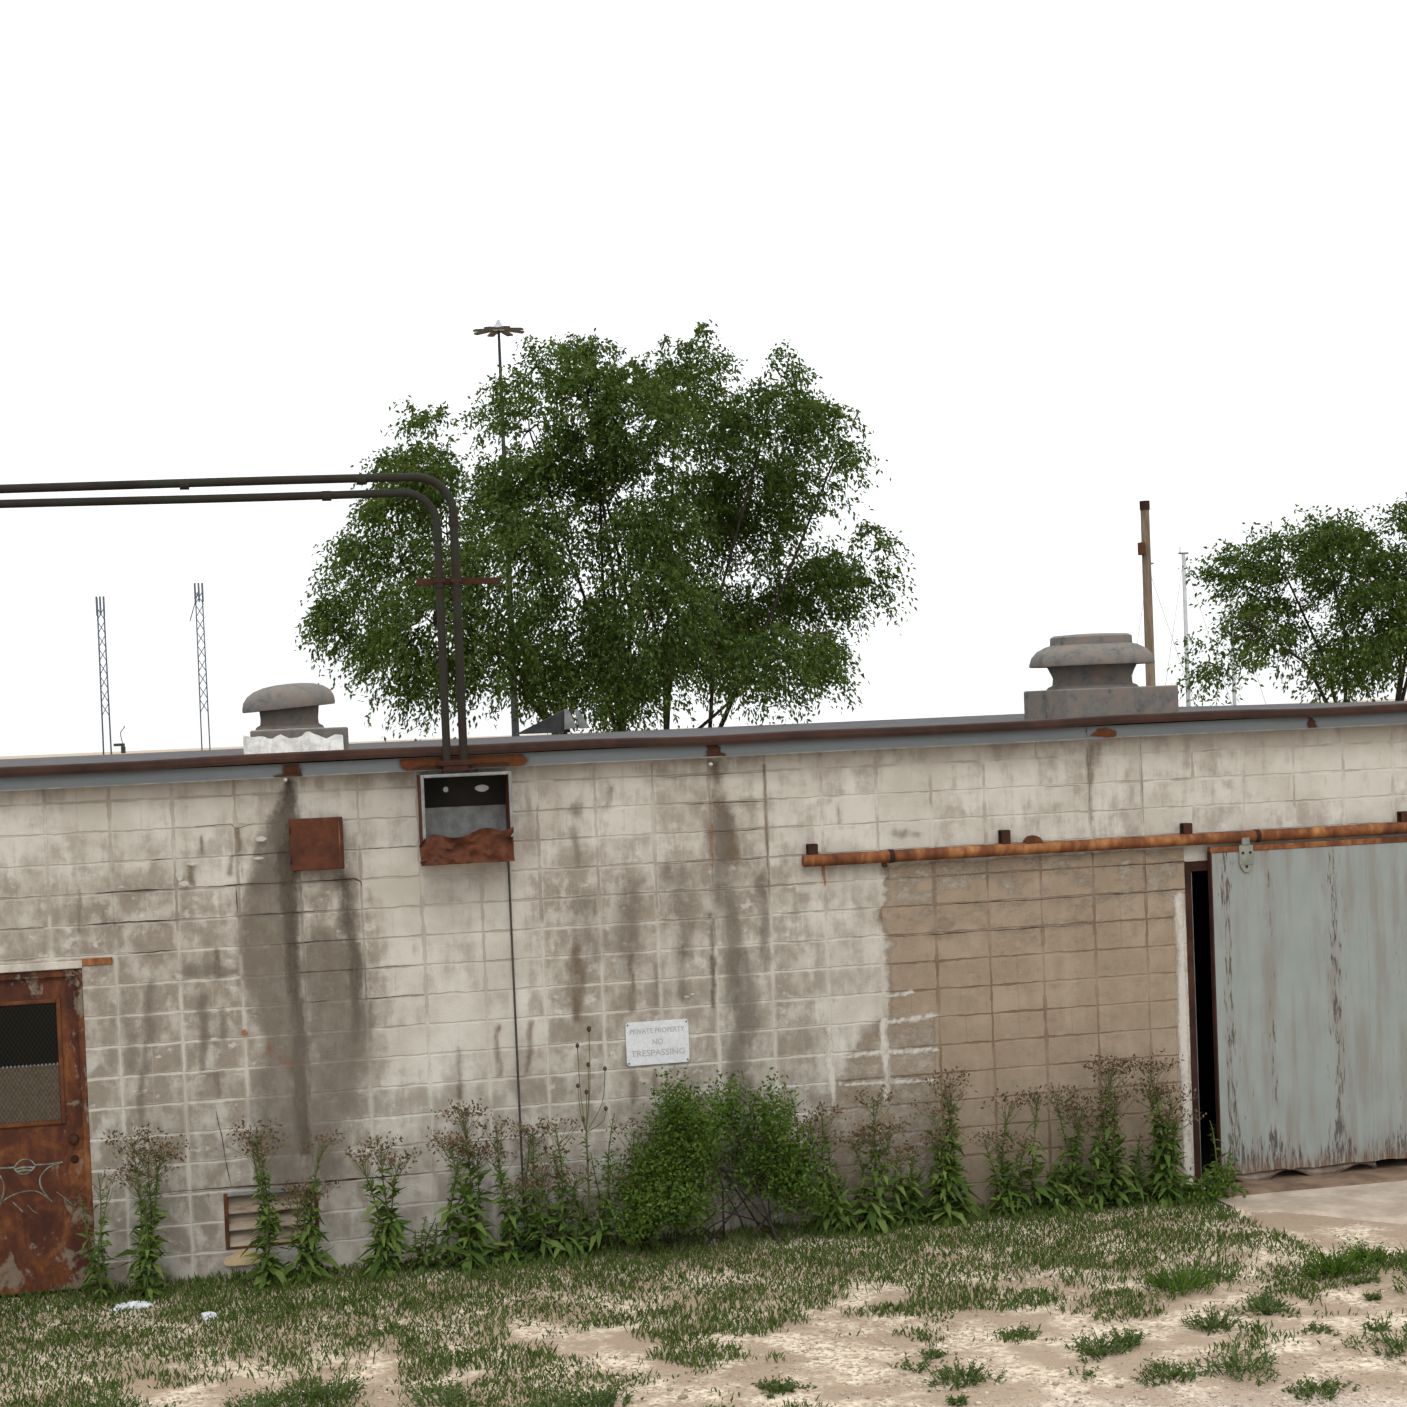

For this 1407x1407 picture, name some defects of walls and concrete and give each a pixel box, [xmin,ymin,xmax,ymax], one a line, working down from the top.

leakage [714,801,739,877]
leakage [242,778,371,1187]
leakage [710,898,755,1093]